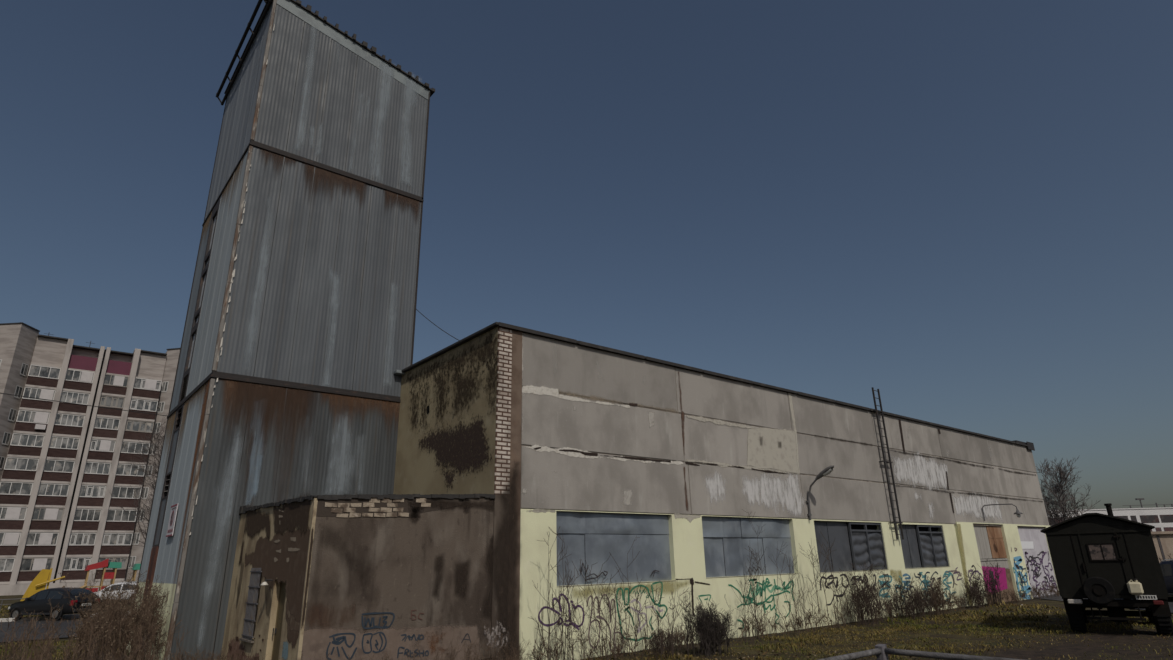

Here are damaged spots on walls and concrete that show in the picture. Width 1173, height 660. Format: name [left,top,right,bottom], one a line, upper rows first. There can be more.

rust [262,149,366,201]
rust [166,380,210,563]
peeling [245,415,493,648]
leakage [406,331,500,429]